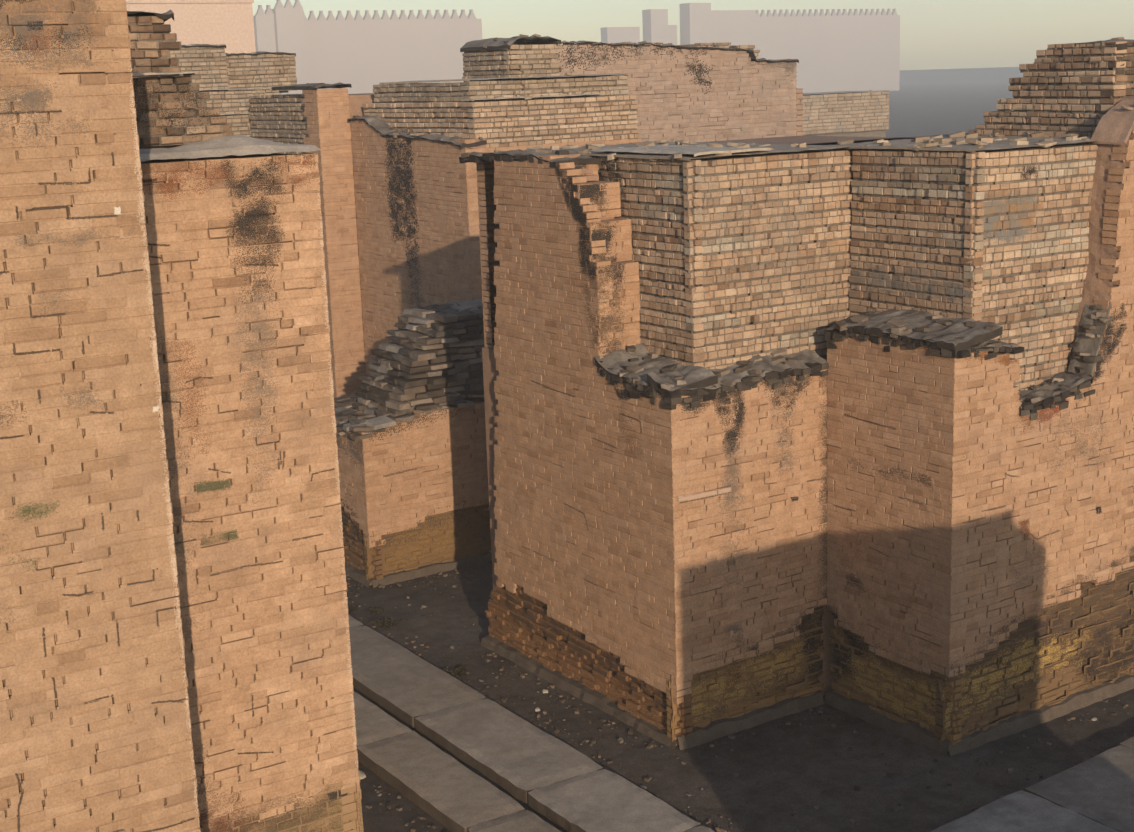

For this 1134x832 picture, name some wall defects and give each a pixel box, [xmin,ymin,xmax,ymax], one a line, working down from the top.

leakage [220,112,312,511]
leakage [1093,303,1127,381]
leakage [340,499,467,567]
leakage [679,371,1134,733]
leakage [203,780,341,832]